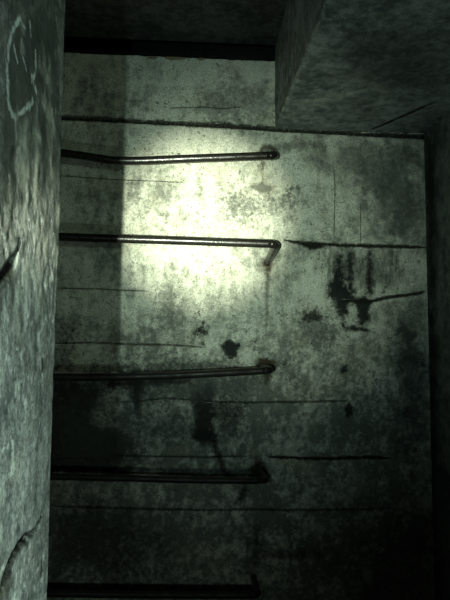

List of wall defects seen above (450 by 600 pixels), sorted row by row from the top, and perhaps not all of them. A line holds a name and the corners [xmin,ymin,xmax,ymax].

crack [284,212,426,249]
damp [328,251,373,332]
crack [342,291,425,303]
crack [55,340,197,348]
damp [59,340,257,477]
crack [269,454,389,462]
crack [0,532,29,585]